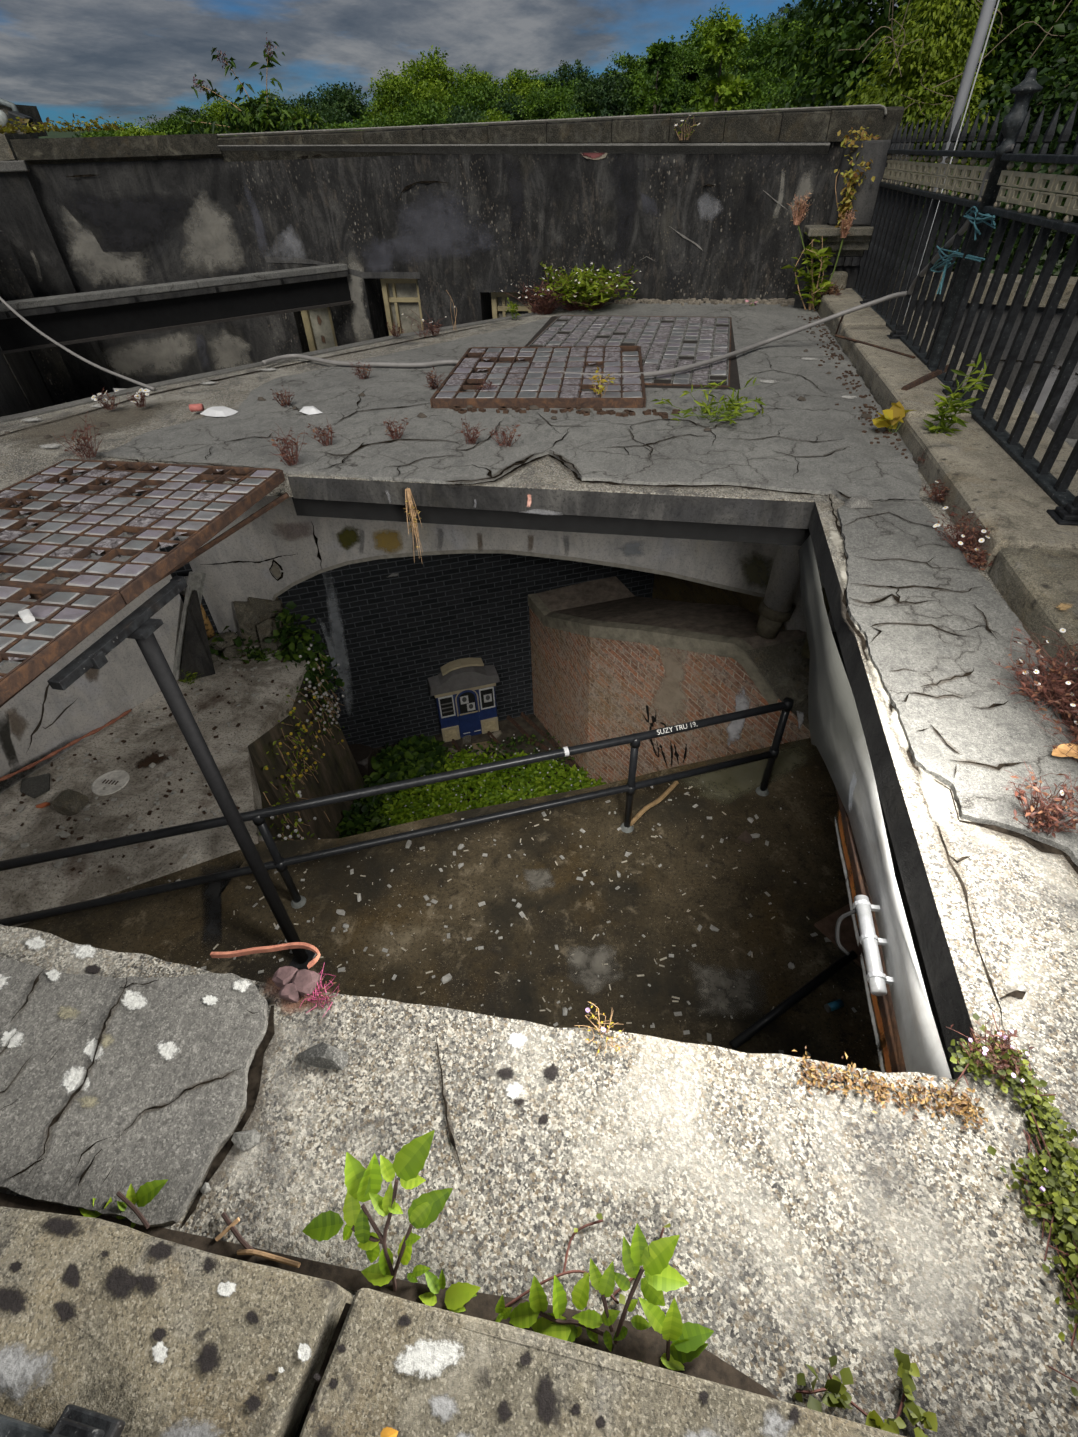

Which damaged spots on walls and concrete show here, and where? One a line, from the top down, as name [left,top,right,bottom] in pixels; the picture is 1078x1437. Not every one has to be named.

damp [64,207,146,284]
damp [184,196,244,272]
damp [245,191,302,257]
damp [347,196,491,341]
damp [102,332,250,377]
crack [108,391,582,483]
crack [617,360,852,477]
crack [200,521,322,568]
crack [836,490,1027,777]
crack [0,967,239,1190]
crack [435,1031,466,1179]